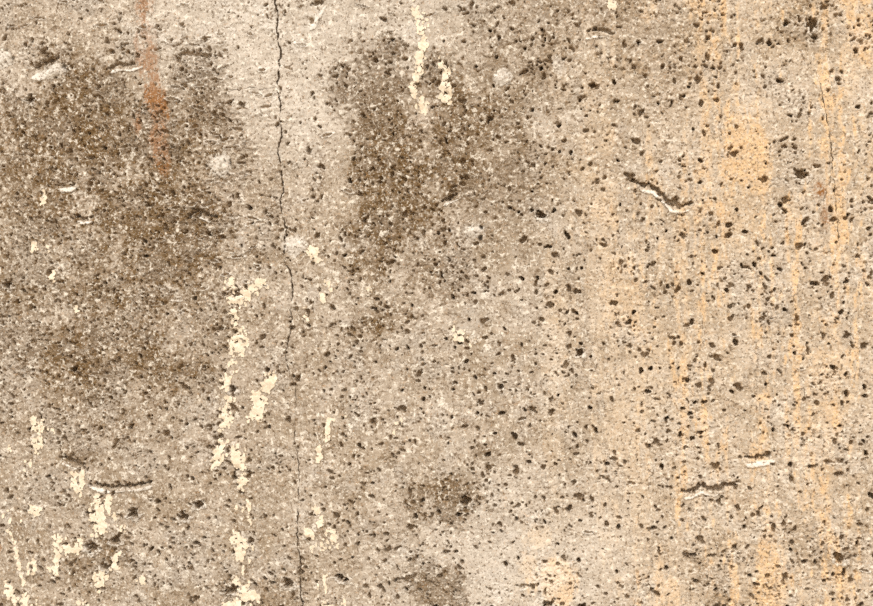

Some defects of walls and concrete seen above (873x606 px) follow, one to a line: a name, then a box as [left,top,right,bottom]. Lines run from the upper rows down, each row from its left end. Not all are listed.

rust [131,0,173,180]
leakage [0,30,258,483]
crack [229,0,296,408]
leakage [313,0,873,606]
peeling [23,415,56,472]
peeling [1,462,144,606]
peeling [219,529,261,606]
peeling [210,276,278,526]
crack [294,432,304,605]
peeling [303,504,339,554]
peeling [315,414,348,463]
spalling [317,573,352,606]